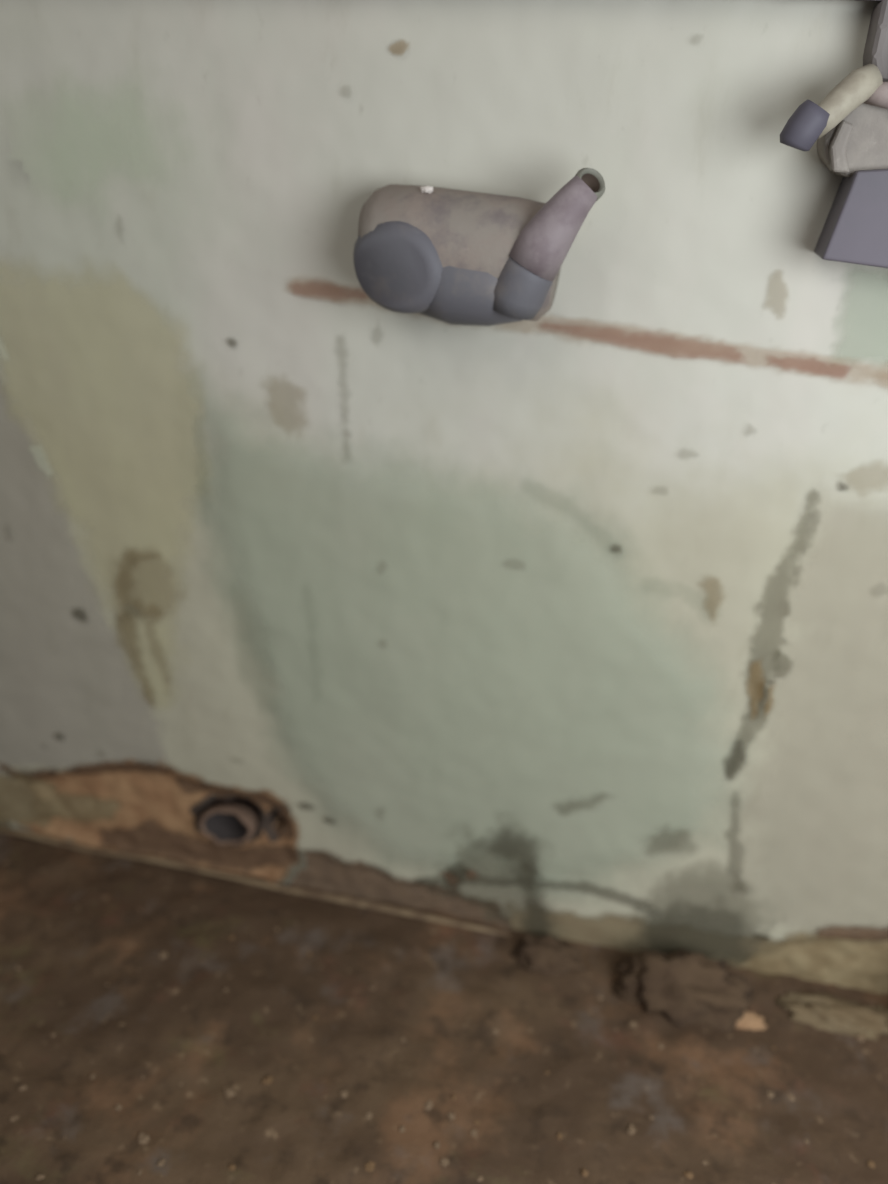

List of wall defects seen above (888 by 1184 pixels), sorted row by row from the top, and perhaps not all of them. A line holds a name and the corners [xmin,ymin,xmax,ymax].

flaking render [0,760,510,930]
flaking render [725,927,888,995]